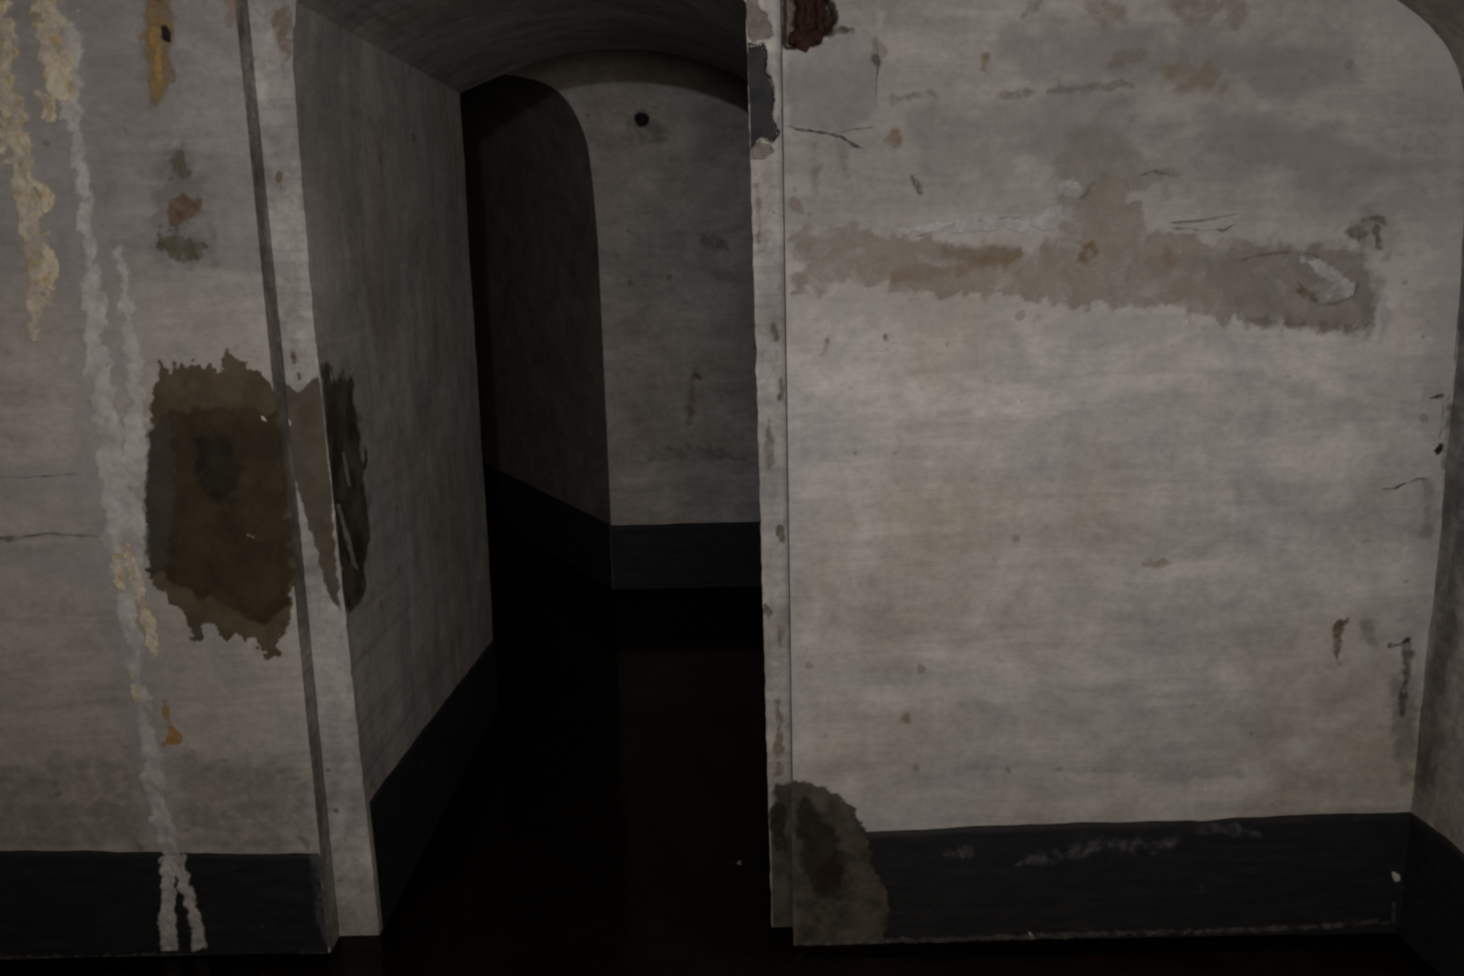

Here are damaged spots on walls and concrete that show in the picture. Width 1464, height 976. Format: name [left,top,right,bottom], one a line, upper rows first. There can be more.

corrosion [145,0,172,104]
spalling [746,0,853,159]
leakage [0,0,370,951]
leakage [769,781,890,955]